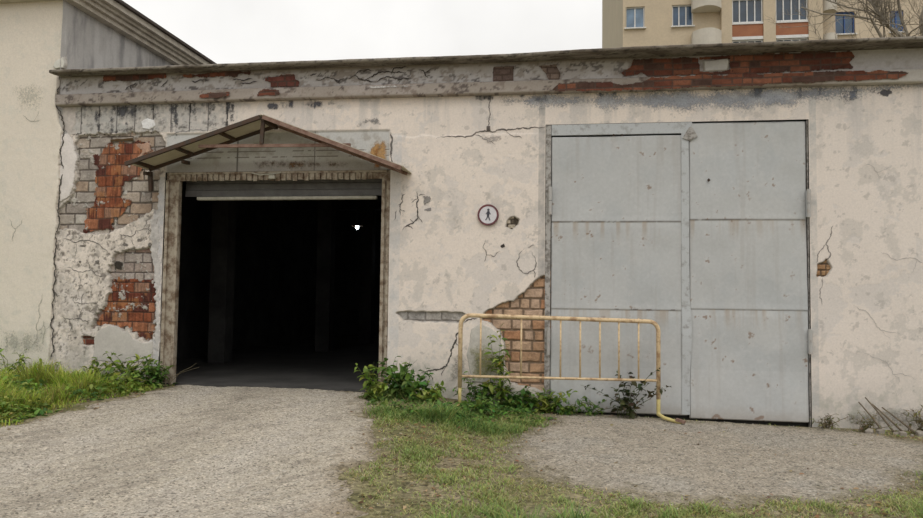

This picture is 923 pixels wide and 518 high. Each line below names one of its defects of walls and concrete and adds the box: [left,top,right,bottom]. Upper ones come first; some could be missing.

spalling [257,74,299,96]
crack [310,66,431,84]
spalling [493,66,514,82]
flaking render [508,51,923,111]
crack [445,99,543,144]
flaking render [59,118,166,234]
crack [394,194,425,229]
flaking render [74,239,157,345]
crack [422,318,478,375]
flaking render [482,271,551,390]